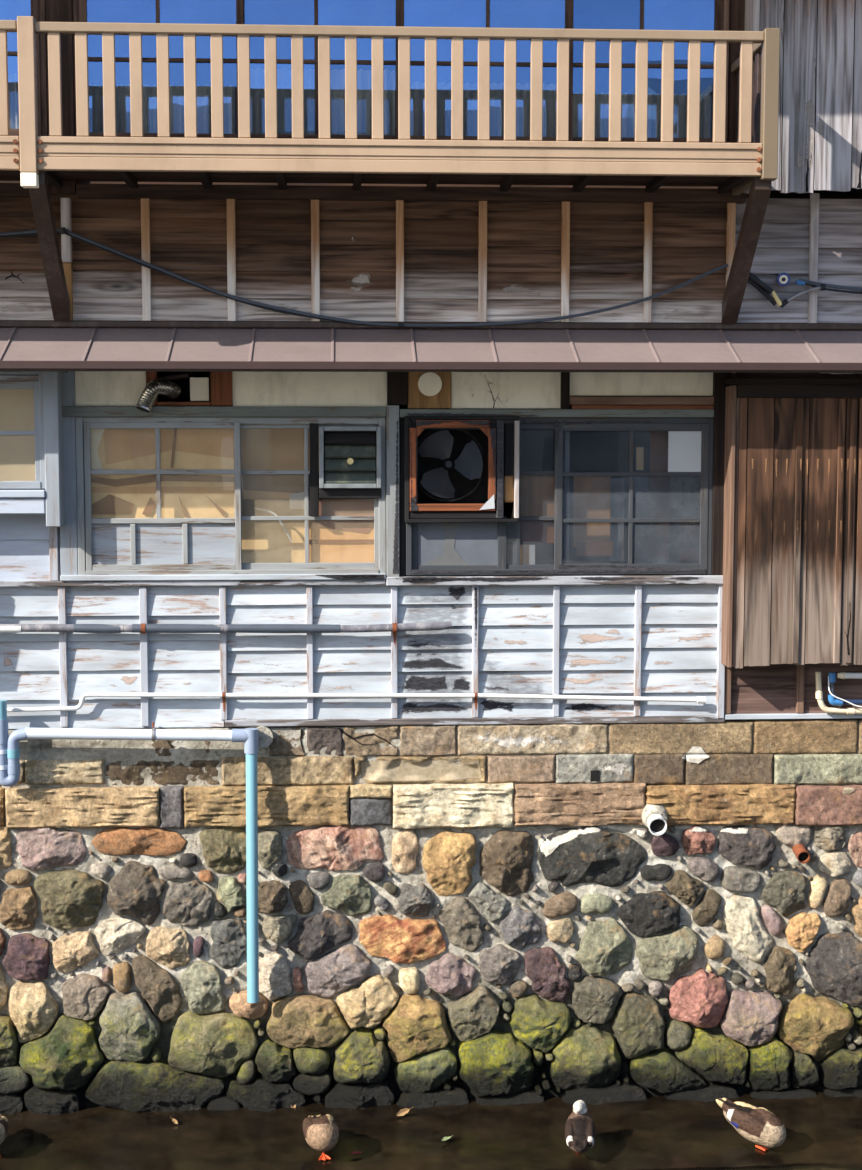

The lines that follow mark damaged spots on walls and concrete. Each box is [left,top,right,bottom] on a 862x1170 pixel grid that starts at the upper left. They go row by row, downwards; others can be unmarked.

peeling [577,629,623,644]
peeling [562,656,626,689]
crack [337,728,395,747]